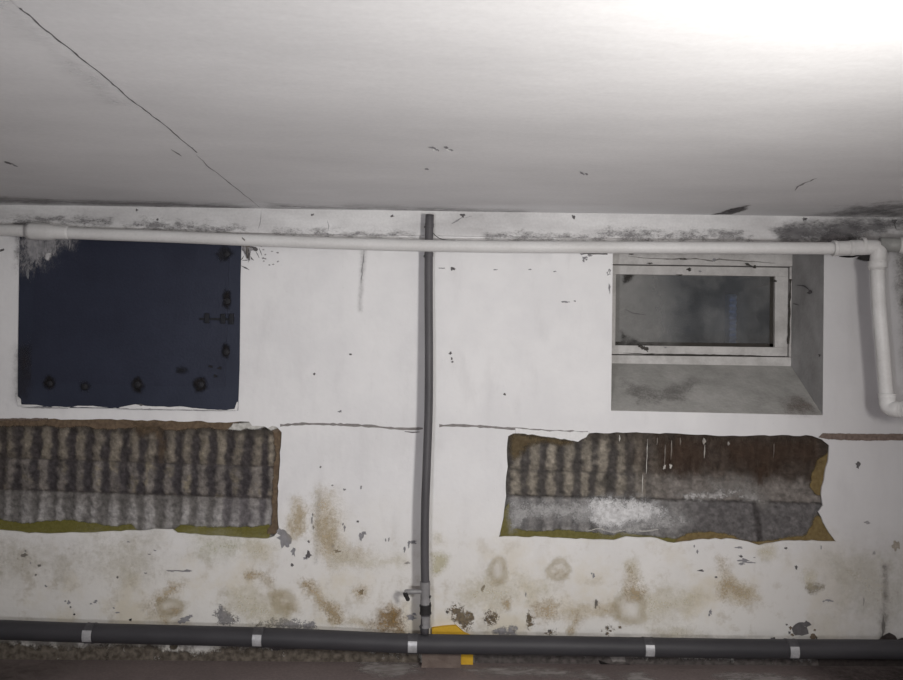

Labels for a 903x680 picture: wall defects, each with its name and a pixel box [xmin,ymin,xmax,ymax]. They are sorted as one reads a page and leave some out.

crack [13,3,261,228]
leakage [774,219,903,242]
flaking render [0,419,312,567]
flaking render [499,432,835,565]
peeling [101,644,421,663]
leakage [446,604,556,635]